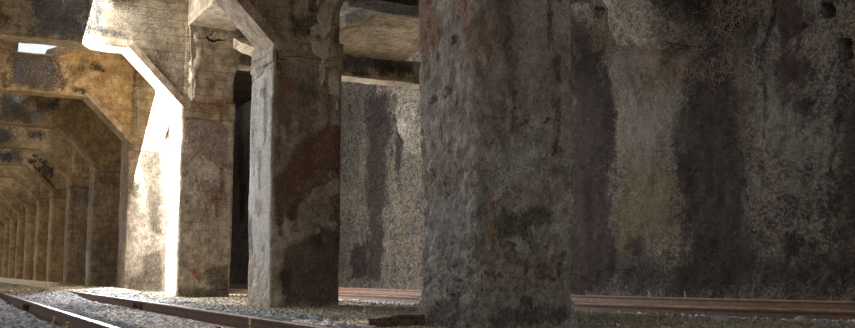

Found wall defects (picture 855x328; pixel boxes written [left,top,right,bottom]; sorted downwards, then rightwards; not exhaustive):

water stain [0,49,105,162]
water stain [26,0,146,46]
water stain [187,71,339,306]
corrosion [274,62,341,237]
peeling [302,0,341,110]
corrosion [329,194,340,249]
water stain [342,55,414,280]
water stain [568,0,855,300]